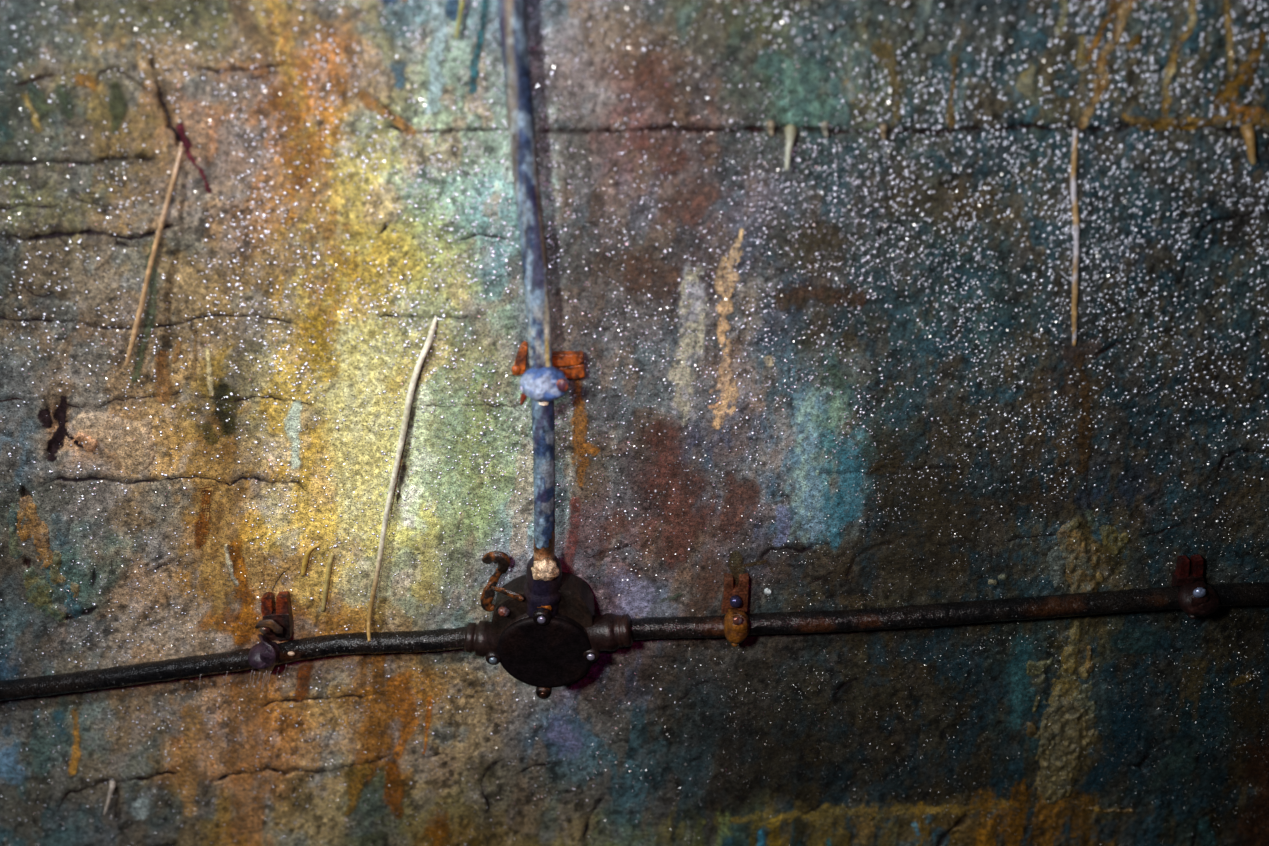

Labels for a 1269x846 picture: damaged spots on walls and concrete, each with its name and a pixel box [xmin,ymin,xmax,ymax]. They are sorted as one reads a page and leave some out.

crack [96,52,183,145]
rust [262,0,375,348]
crack [540,124,1137,153]
rust [1123,31,1269,131]
crack [0,197,179,265]
crack [100,314,294,332]
crack [23,475,309,493]
rust [181,404,260,645]
leakage [1046,509,1131,593]
rust [69,709,80,774]
rust [344,653,432,819]
leakage [656,621,1141,846]